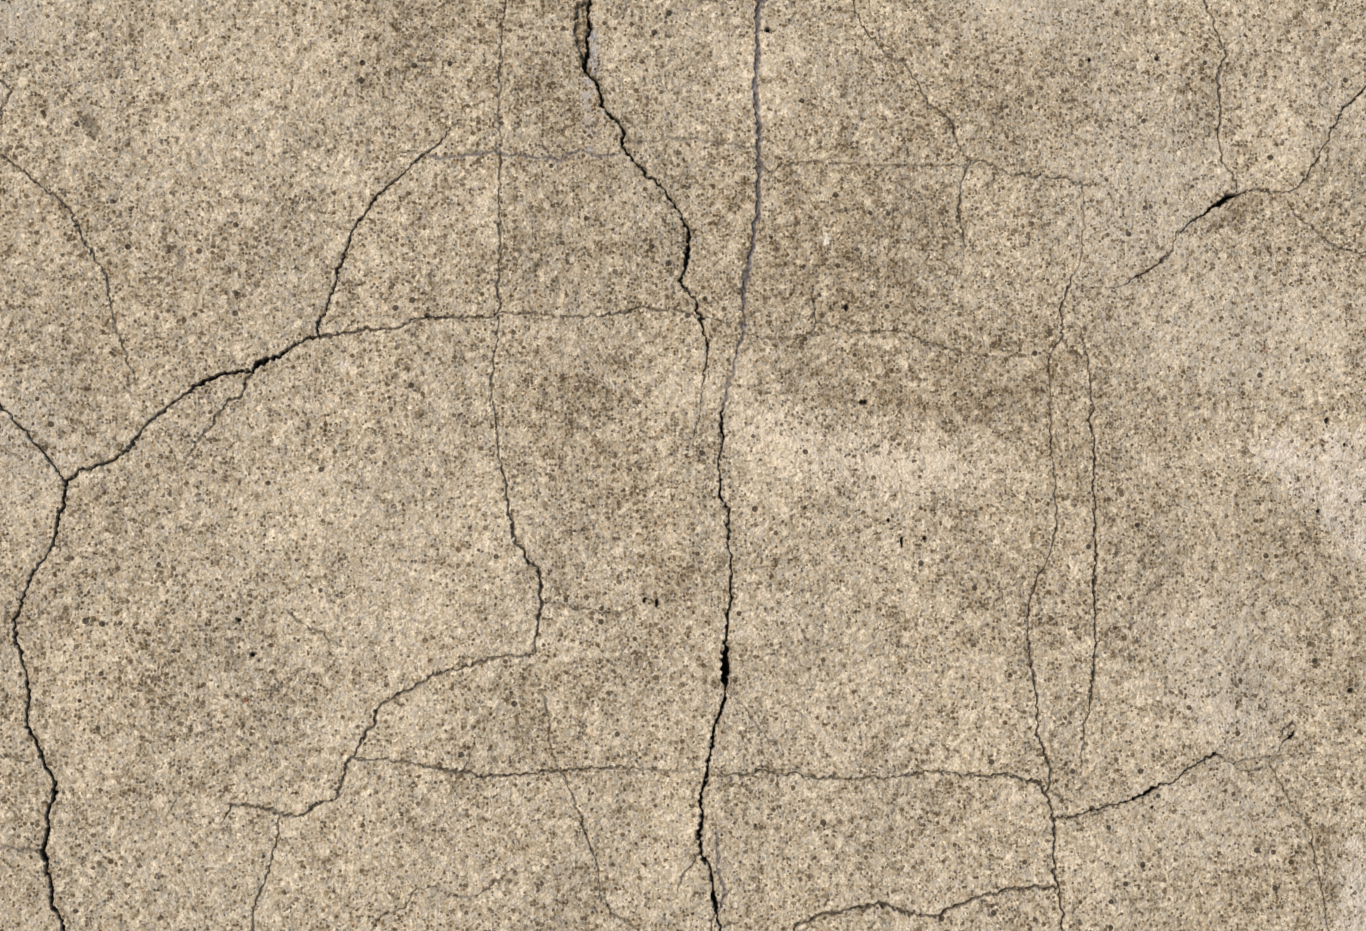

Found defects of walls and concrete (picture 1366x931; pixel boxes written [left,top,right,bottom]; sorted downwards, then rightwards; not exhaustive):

crack [0,0,748,931]
crack [622,0,1366,931]